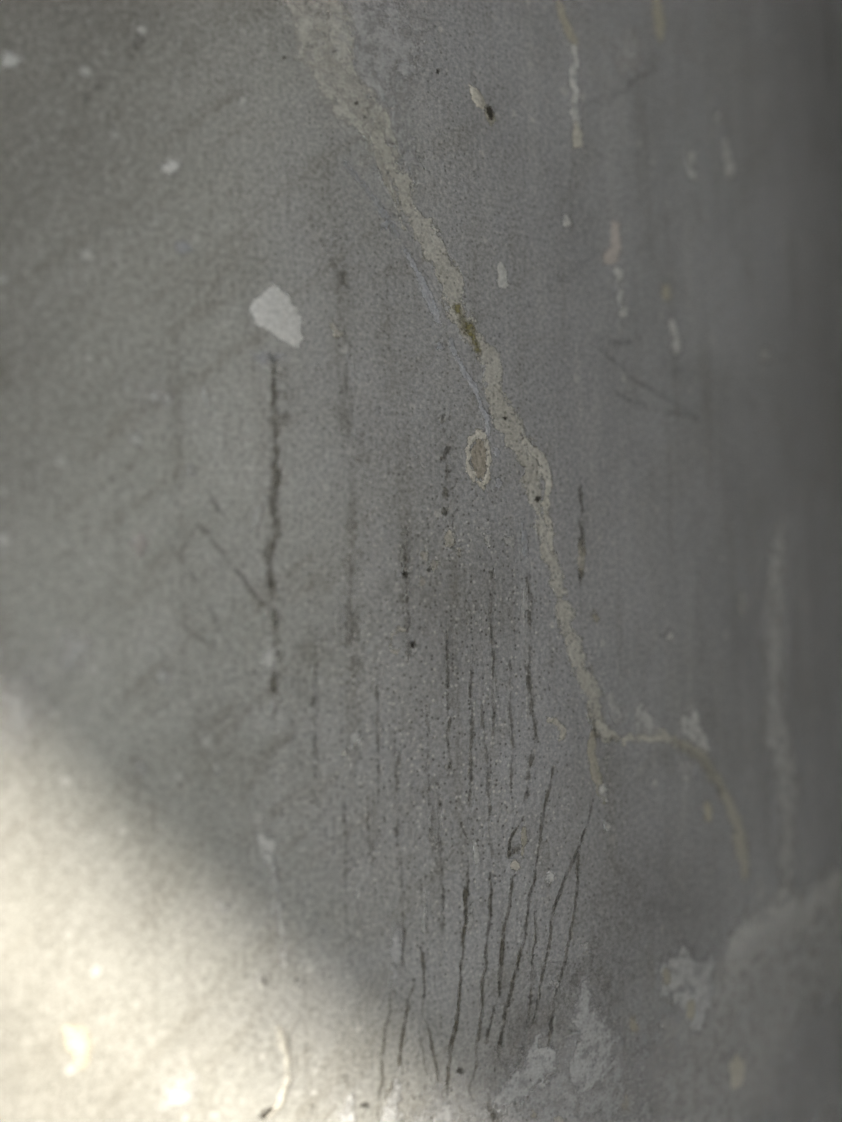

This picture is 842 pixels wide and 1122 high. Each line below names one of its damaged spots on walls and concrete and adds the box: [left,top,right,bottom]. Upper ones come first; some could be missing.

peeling [248,285,304,349]
spalling [436,337,503,490]
crack [282,0,752,880]